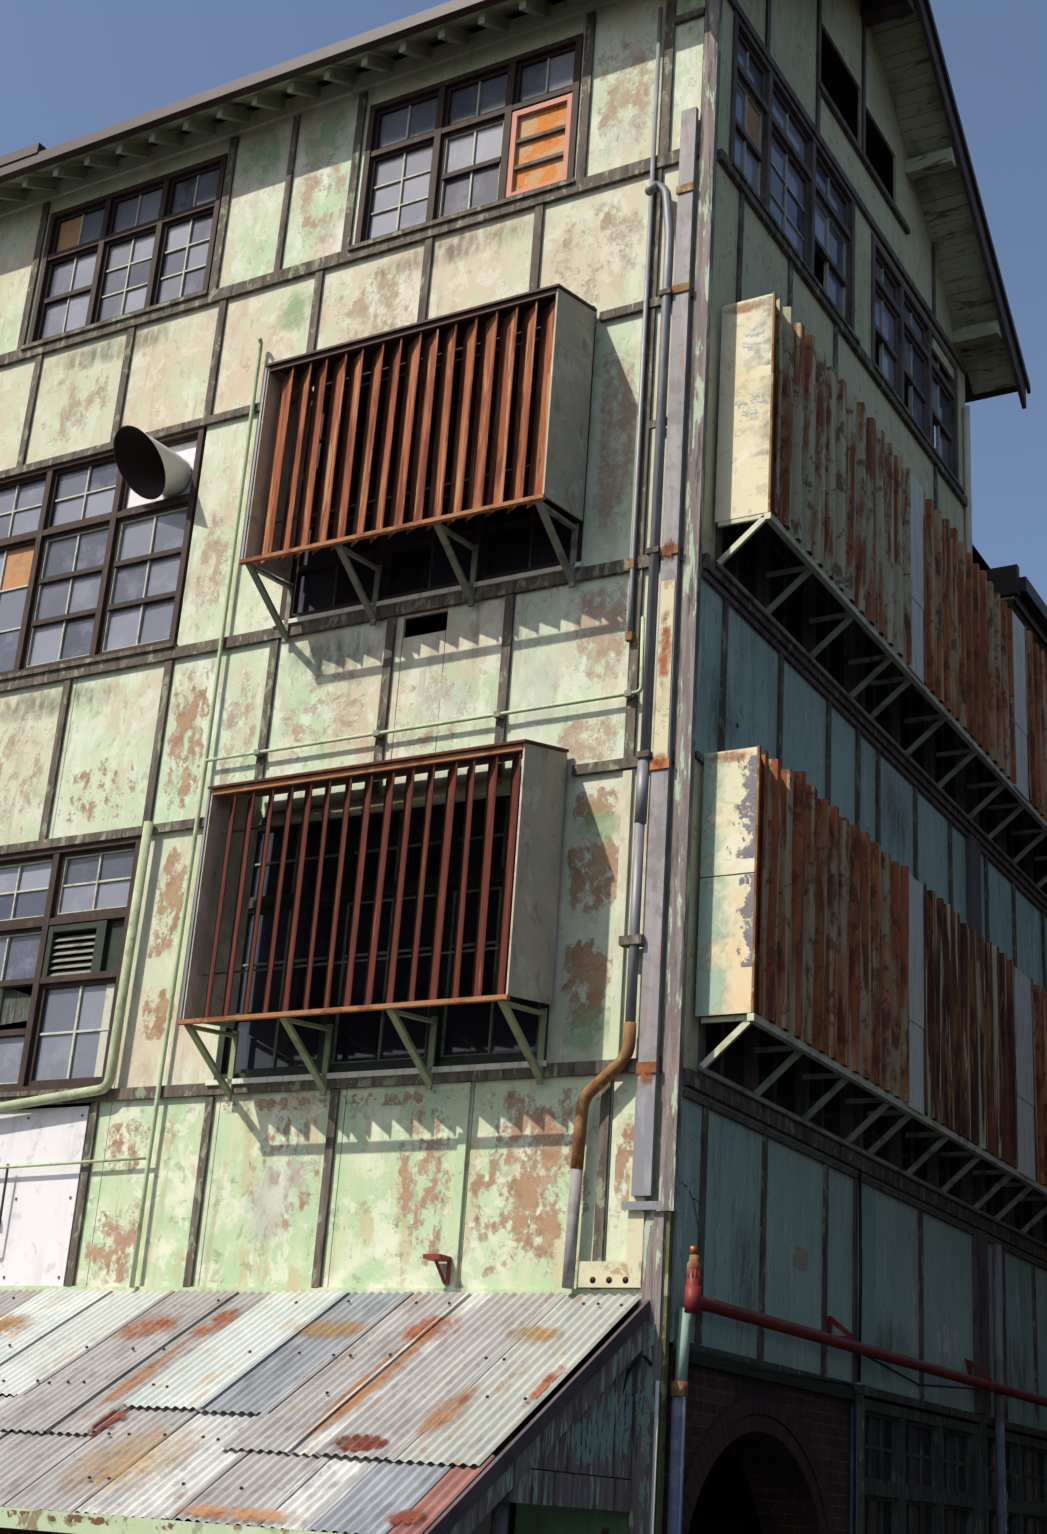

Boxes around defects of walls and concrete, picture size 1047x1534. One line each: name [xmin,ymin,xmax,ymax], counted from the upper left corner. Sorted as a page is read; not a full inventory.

peeling [164,664,260,810]
peeling [147,846,188,958]
peeling [567,786,619,914]
peeling [561,938,614,1030]
peeling [344,1088,588,1277]
peeling [85,1211,138,1283]
rust [0,1316,24,1332]
rust [86,1309,237,1435]
rust [303,1316,450,1452]
rust [532,1368,563,1400]
rust [186,1505,284,1521]
rust [387,1509,425,1525]